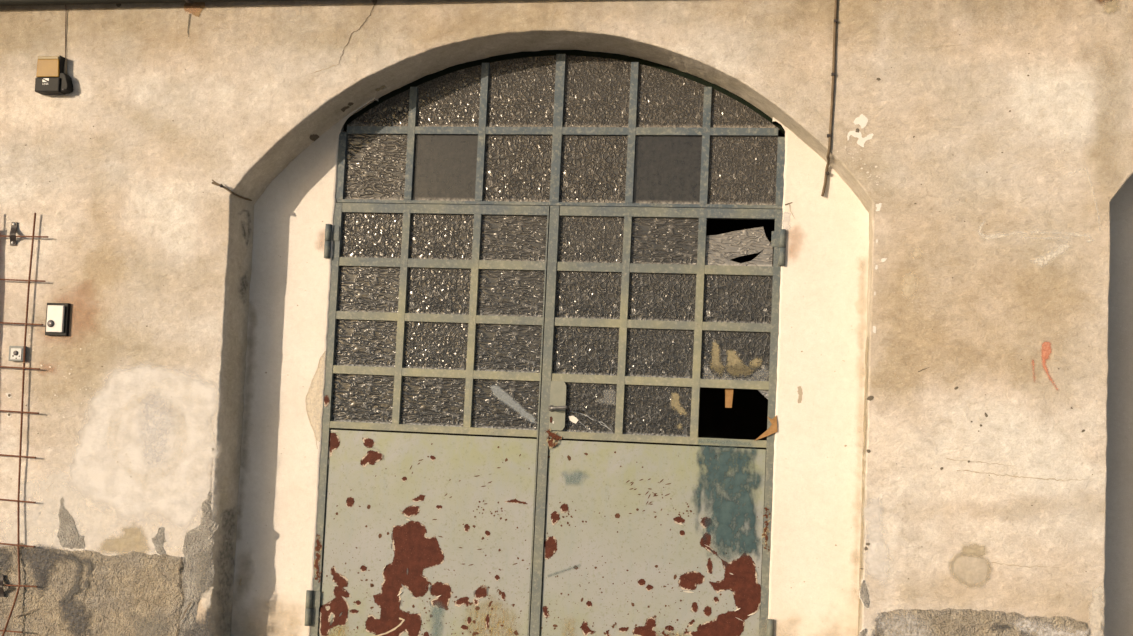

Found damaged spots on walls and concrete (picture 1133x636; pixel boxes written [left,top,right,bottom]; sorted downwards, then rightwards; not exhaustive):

crack [311,5,375,74]
corrosion [328,430,340,464]
corrosion [360,438,384,468]
flaking render [56,497,86,550]
water stain [101,528,147,553]
flaking render [151,526,167,555]
flaking render [178,489,219,636]
corrosion [314,495,512,636]
corrosion [568,517,761,636]
corrosion [762,507,771,552]
flaking render [858,568,883,636]